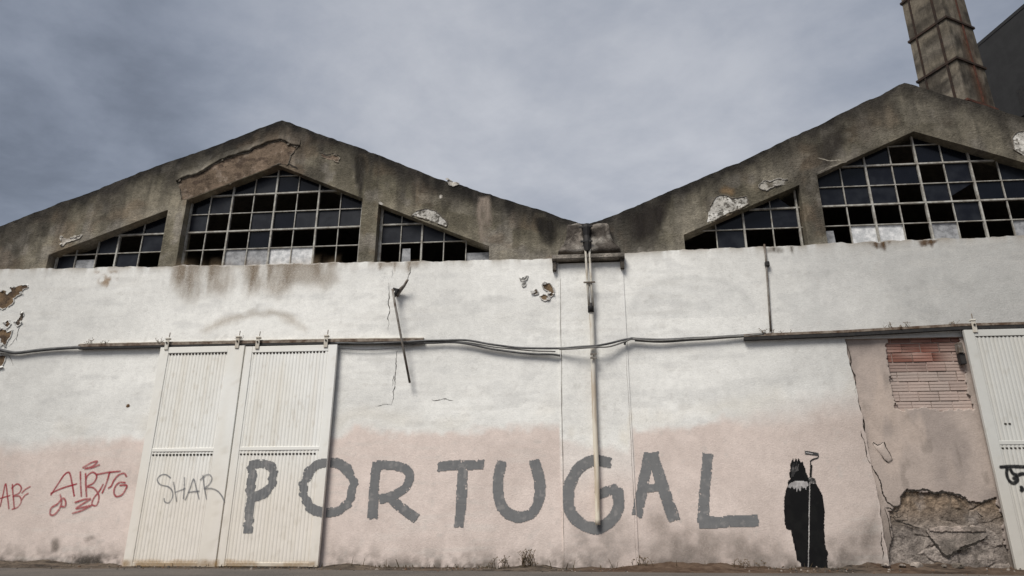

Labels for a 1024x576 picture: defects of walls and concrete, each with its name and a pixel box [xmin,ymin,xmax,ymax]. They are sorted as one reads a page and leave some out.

crack [176,133,362,194]
spalling [411,178,459,227]
spalling [706,195,749,223]
spalling [758,178,788,191]
spalling [1011,130,1024,155]
flaking render [60,235,82,246]
peeling [519,275,555,301]
peeling [0,284,29,369]
flaking render [885,338,973,411]
crack [846,343,995,558]
spalling [888,489,1010,568]